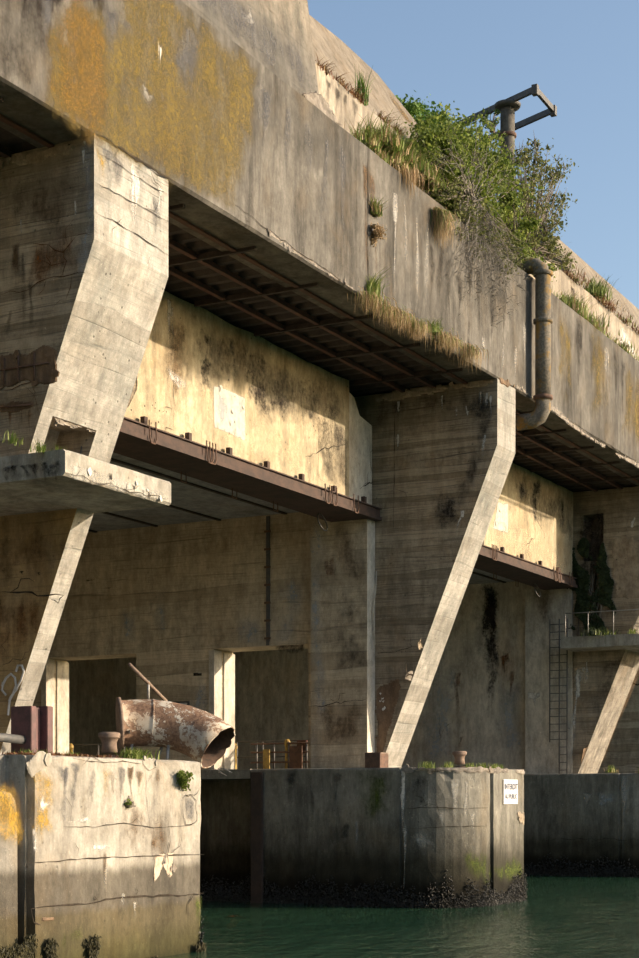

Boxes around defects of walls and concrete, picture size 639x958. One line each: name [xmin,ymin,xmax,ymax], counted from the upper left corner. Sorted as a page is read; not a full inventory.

spalling [0,345,60,390]
peeling [214,385,245,440]
leakage [197,339,346,485]
crack [2,578,64,603]
leakage [483,587,498,661]
spalling [375,670,414,752]